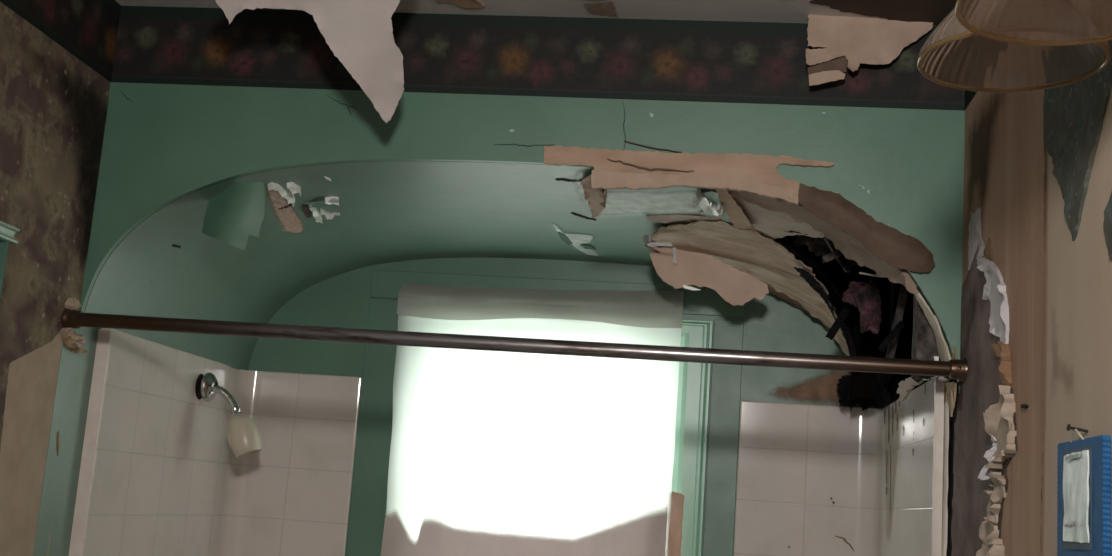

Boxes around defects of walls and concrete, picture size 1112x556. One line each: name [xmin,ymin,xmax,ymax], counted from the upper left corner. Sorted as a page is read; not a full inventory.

peeling [809,0,956,26]
water stain [61,78,108,256]
peeling [202,182,340,250]
water stain [969,98,998,203]
spalling [553,175,1002,556]